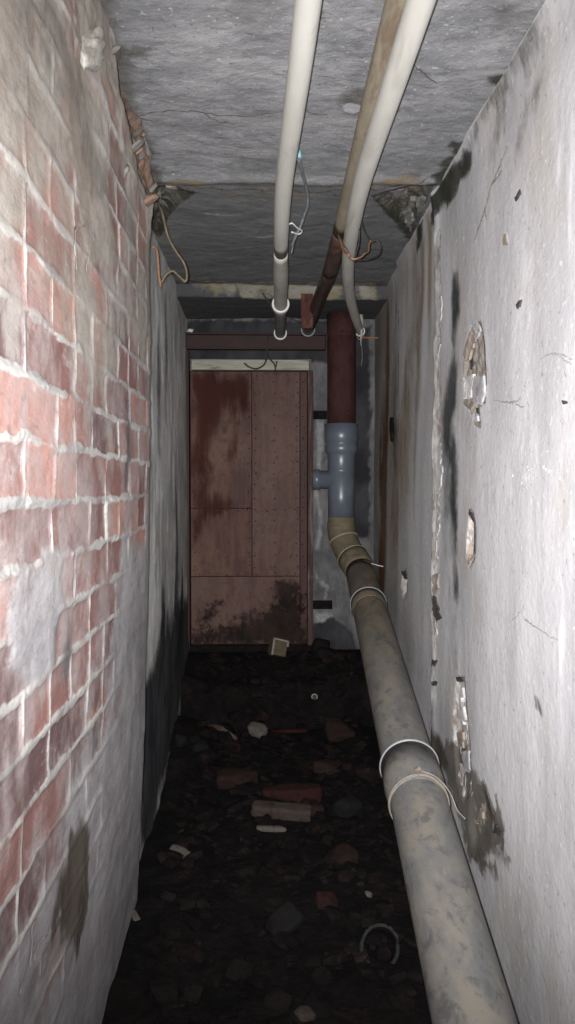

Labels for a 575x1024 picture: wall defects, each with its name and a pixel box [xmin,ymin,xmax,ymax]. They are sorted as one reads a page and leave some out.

spalling [112,45,194,238]
water stain [376,141,471,373]
flaking render [461,322,486,428]
water stain [157,501,183,684]
water stain [275,579,307,634]
flaking render [466,509,476,567]
water stain [431,729,510,878]
flaking render [452,675,504,847]
water stain [52,824,90,956]